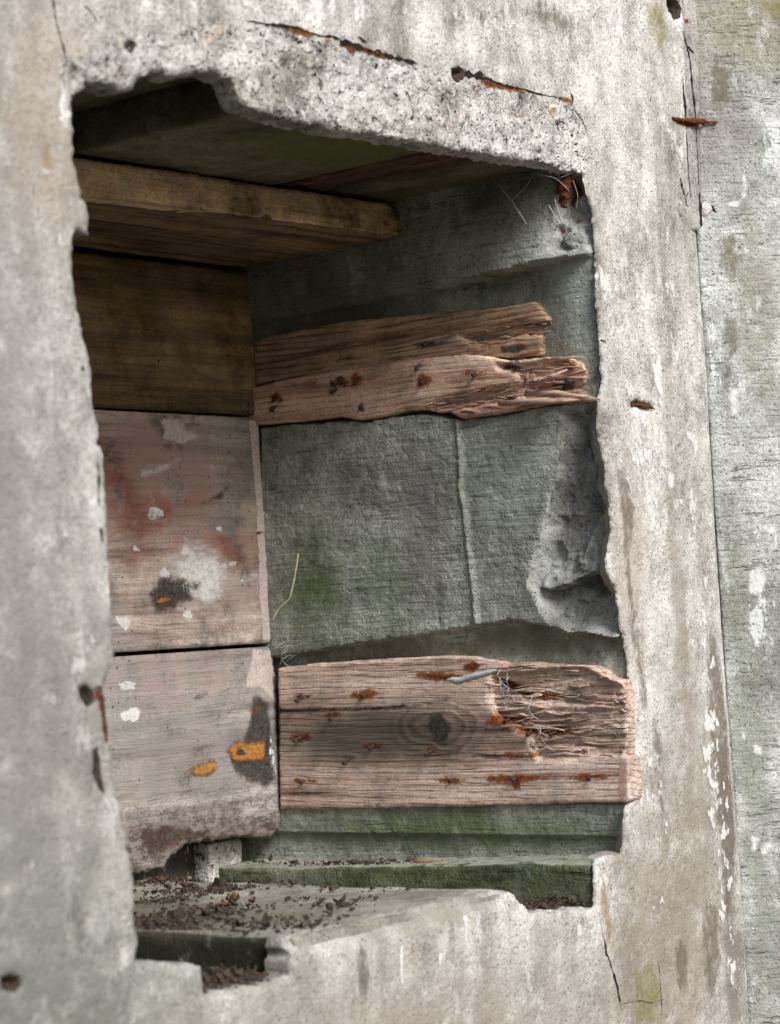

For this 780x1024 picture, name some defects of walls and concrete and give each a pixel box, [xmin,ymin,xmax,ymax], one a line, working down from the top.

corrosion [288,25,313,38]
spalling [57,19,594,257]
corrosion [325,39,391,59]
corrosion [481,80,525,93]
crack [680,32,716,227]
corrosion [570,179,584,207]
spalling [526,402,621,637]
corrosion [95,686,108,743]
leakage [699,609,736,995]
crack [599,914,662,1010]